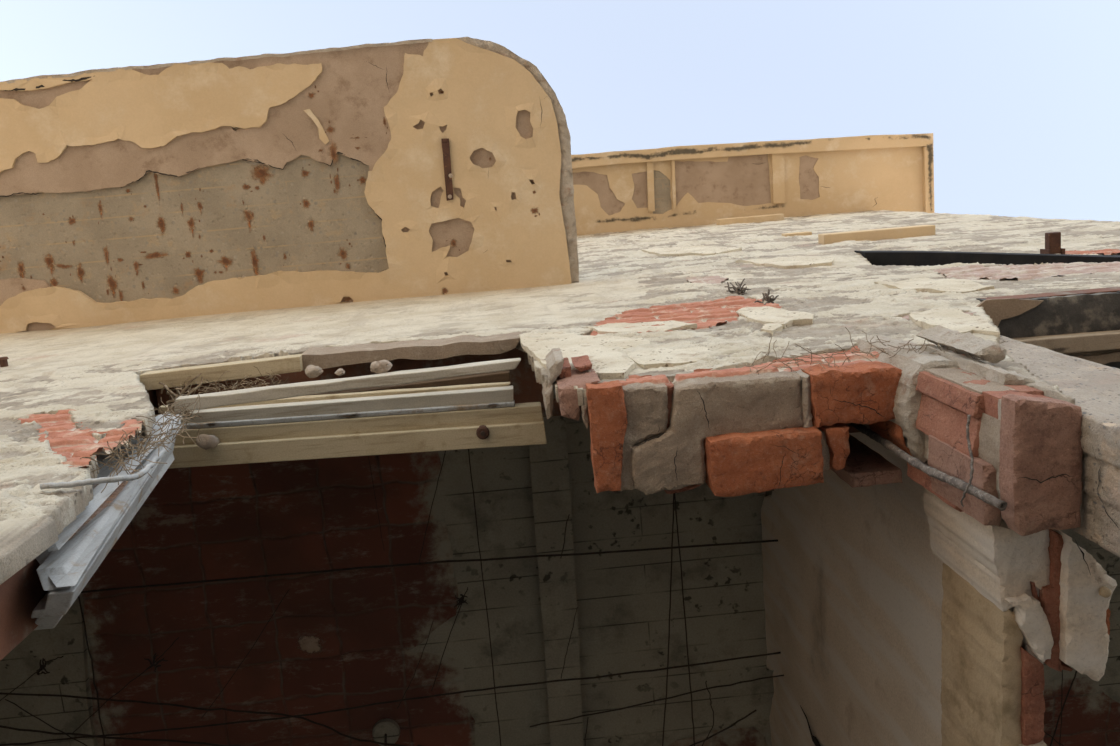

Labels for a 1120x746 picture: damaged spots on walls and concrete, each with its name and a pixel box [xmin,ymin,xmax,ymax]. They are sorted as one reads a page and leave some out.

spalling [0,39,432,306]
corrosion [243,166,271,228]
peeling [429,187,474,257]
peeling [457,37,771,282]
peeling [799,155,820,200]
corrosion [45,254,84,286]
corrosion [104,247,168,301]
corrosion [183,249,232,282]
corrosion [251,236,266,275]
peeling [642,245,834,269]
peeling [21,322,55,332]
crack [638,425,678,478]